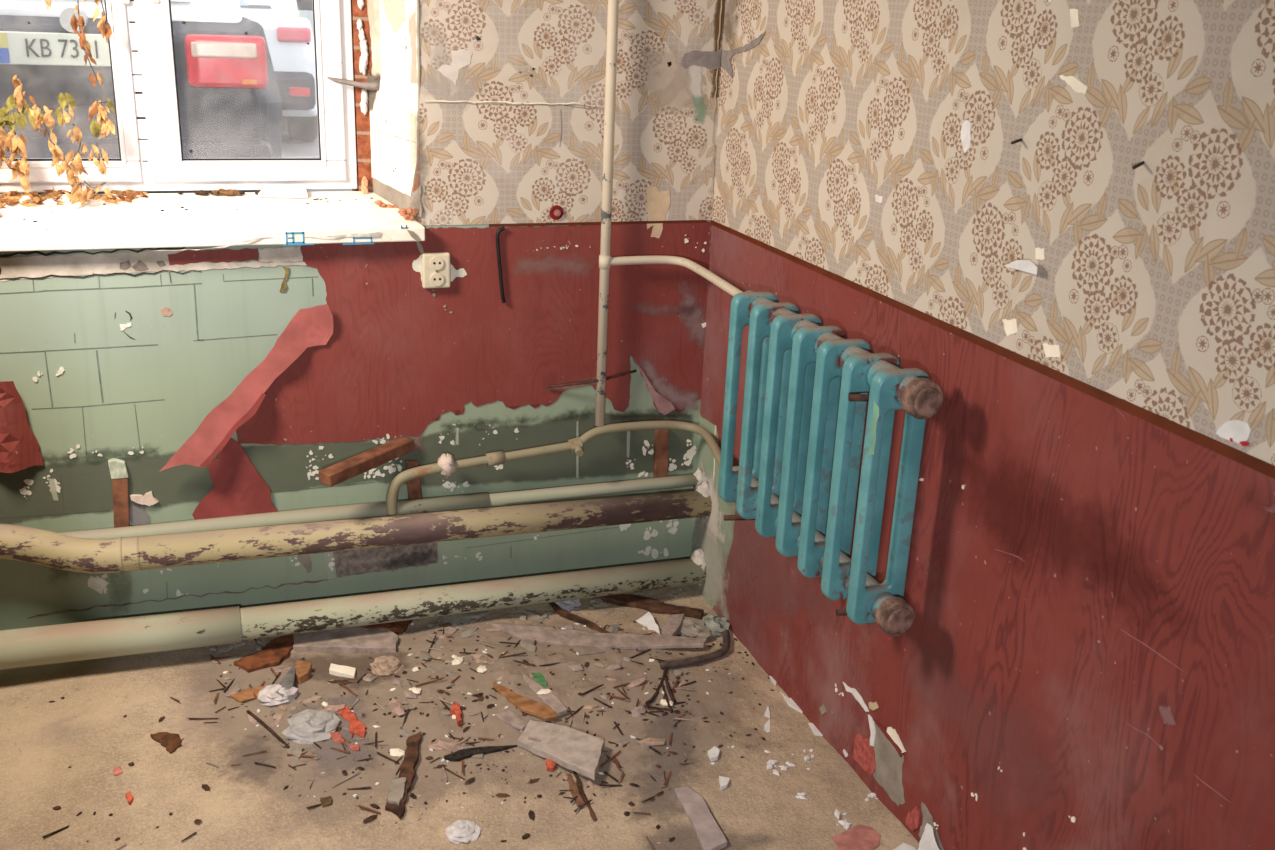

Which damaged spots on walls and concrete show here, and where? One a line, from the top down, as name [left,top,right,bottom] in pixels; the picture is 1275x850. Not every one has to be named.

flaking render [0,236,306,282]
flaking render [407,230,452,314]
flaking render [450,264,467,282]
peeling [19,469,61,499]
peeling [306,446,333,480]
peeling [364,457,402,479]
peeling [443,480,470,492]
peeling [626,440,654,477]
peeling [668,439,697,471]
peeling [638,519,679,559]
spalling [290,542,482,579]
peeling [886,727,906,753]